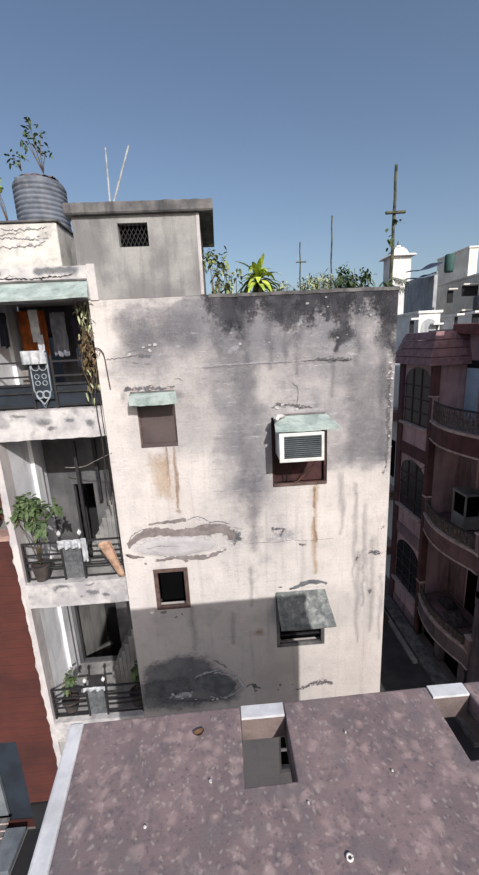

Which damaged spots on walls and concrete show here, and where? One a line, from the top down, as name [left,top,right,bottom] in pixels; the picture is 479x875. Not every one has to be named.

crack [0,225,49,249]
crack [0,273,73,281]
damp [202,286,399,361]
peeling [126,516,243,565]